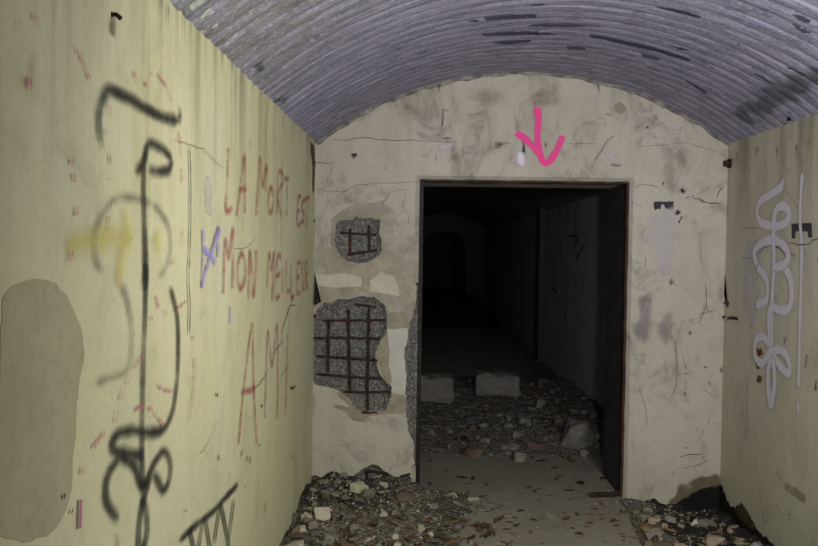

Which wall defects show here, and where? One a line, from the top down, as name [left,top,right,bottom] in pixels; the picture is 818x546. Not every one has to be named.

peeling [0,279,85,543]
spalling [313,203,419,481]